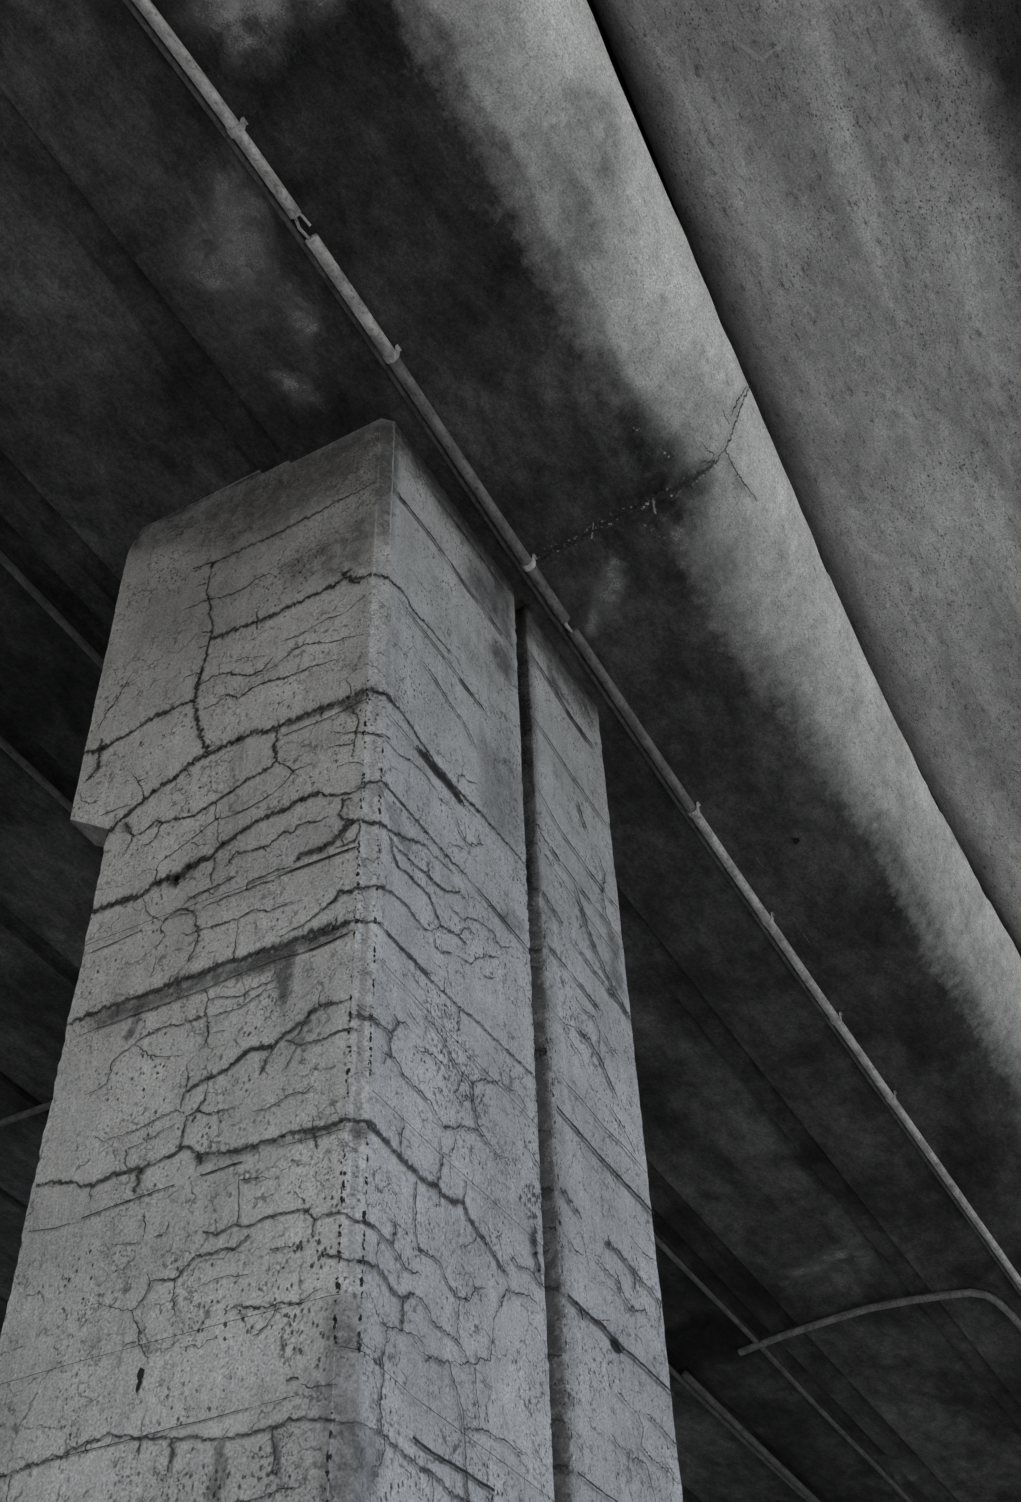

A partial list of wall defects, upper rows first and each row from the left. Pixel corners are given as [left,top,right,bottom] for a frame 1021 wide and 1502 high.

crack [535,381,758,562]
crack [0,481,663,1502]
crack [611,1390,678,1501]